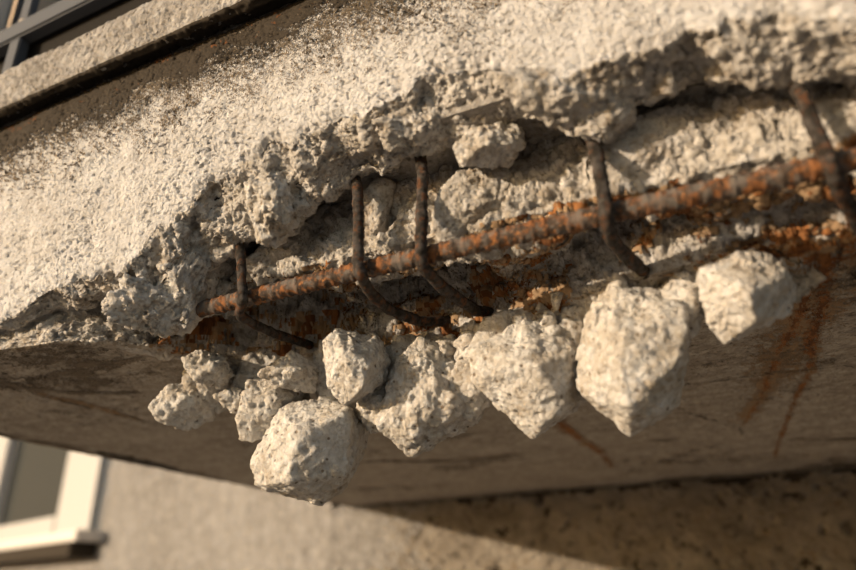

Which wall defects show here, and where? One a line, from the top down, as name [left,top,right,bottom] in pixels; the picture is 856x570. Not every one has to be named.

spalling [466,9,856,235]
corrosion [834,134,856,151]
corrosion [149,282,370,361]
spalling [0,67,536,367]
corrosion [268,255,353,279]
corrosion [379,228,591,347]
corrosion [464,196,598,237]
spalling [433,179,852,314]
corrosion [612,179,681,202]
corrosion [626,178,856,458]
crack [756,248,808,270]